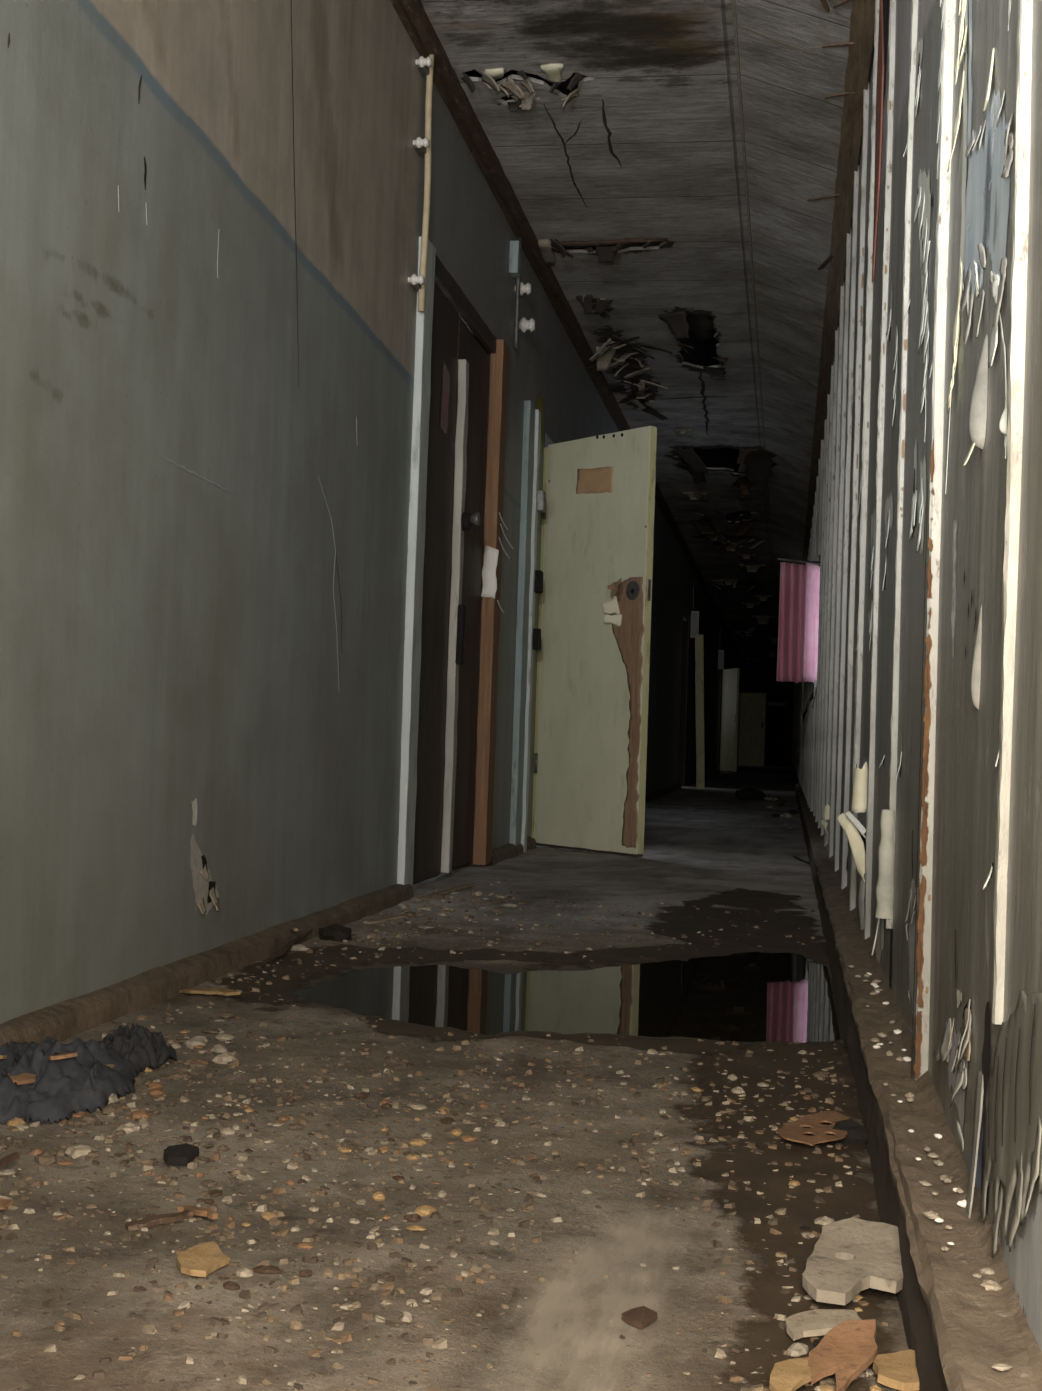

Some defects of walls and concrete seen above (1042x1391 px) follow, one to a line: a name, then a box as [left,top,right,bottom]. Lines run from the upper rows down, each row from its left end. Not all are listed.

crack [544,99,622,207]
damp [520,10,722,67]
peeling [844,0,1014,651]
spalling [190,798,220,915]
peeling [821,735,918,1034]
rust [911,438,935,1080]
peeling [933,990,1042,1351]